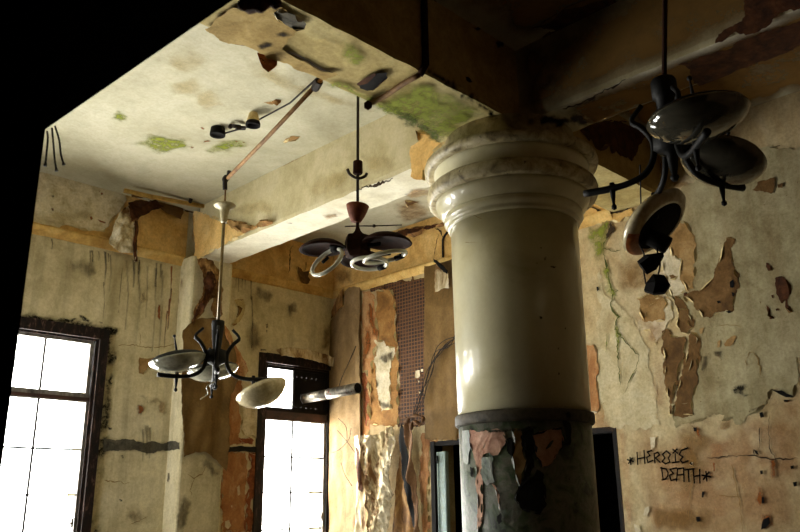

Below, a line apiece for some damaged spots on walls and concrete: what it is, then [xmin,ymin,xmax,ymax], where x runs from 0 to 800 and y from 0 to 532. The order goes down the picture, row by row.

peeling [205,7,338,80]
peeling [679,0,800,86]
damp [142,137,186,152]
damp [209,141,243,152]
spalling [357,73,388,91]
damp [330,82,474,142]
peeling [409,130,444,180]
peeling [587,145,800,449]
spalling [360,276,445,532]
peeling [457,420,571,532]